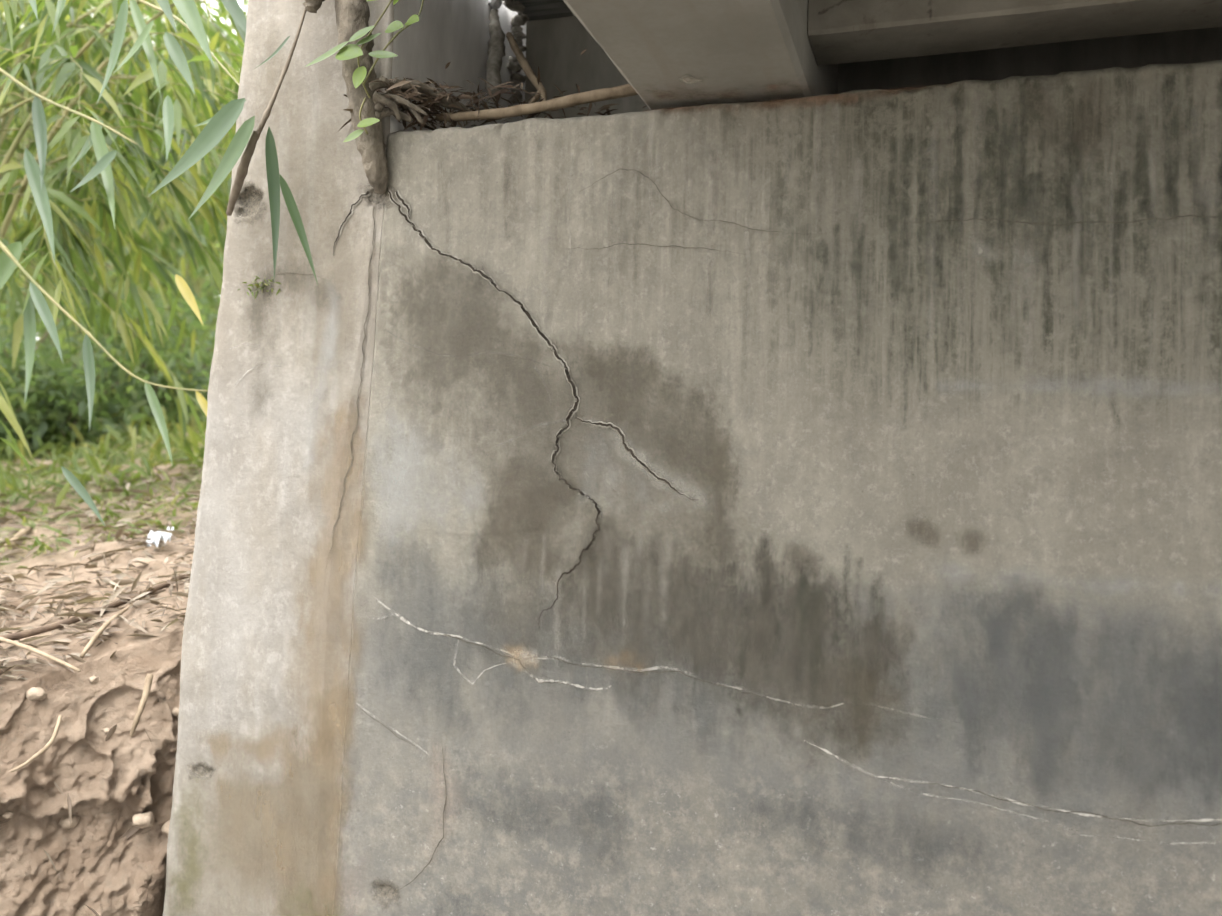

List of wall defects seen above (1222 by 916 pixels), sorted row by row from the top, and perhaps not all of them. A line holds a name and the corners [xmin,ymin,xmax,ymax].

crack [275,190,844,709]
leakage [559,543,895,722]
crack [877,776,1222,845]